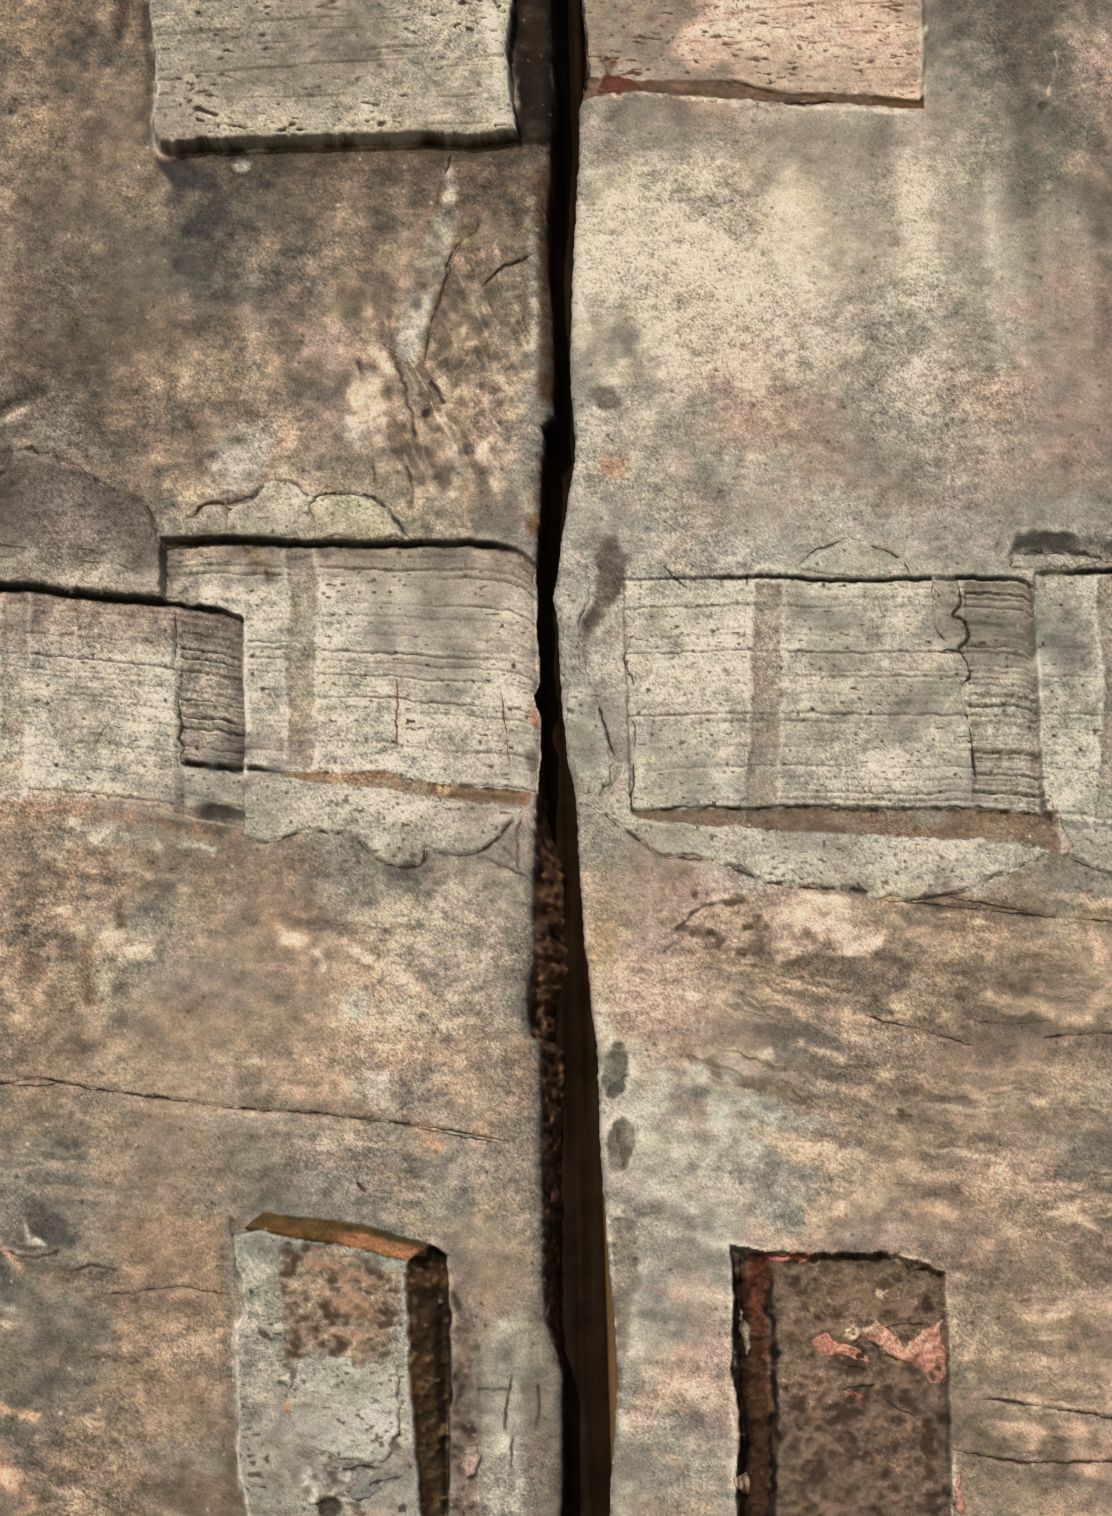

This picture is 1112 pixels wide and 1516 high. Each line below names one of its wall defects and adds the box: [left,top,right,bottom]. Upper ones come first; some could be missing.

damp [967,0,1074,51]
rust [597,49,643,97]
crack [444,156,452,175]
crack [415,221,537,372]
peeling [555,560,1112,903]
peeling [243,777,523,870]
crack [0,1075,516,1144]
spalling [270,1240,409,1506]
spalling [442,1268,487,1516]
spalling [764,1250,966,1516]
crack [977,1397,1112,1420]
crack [953,1449,1112,1466]